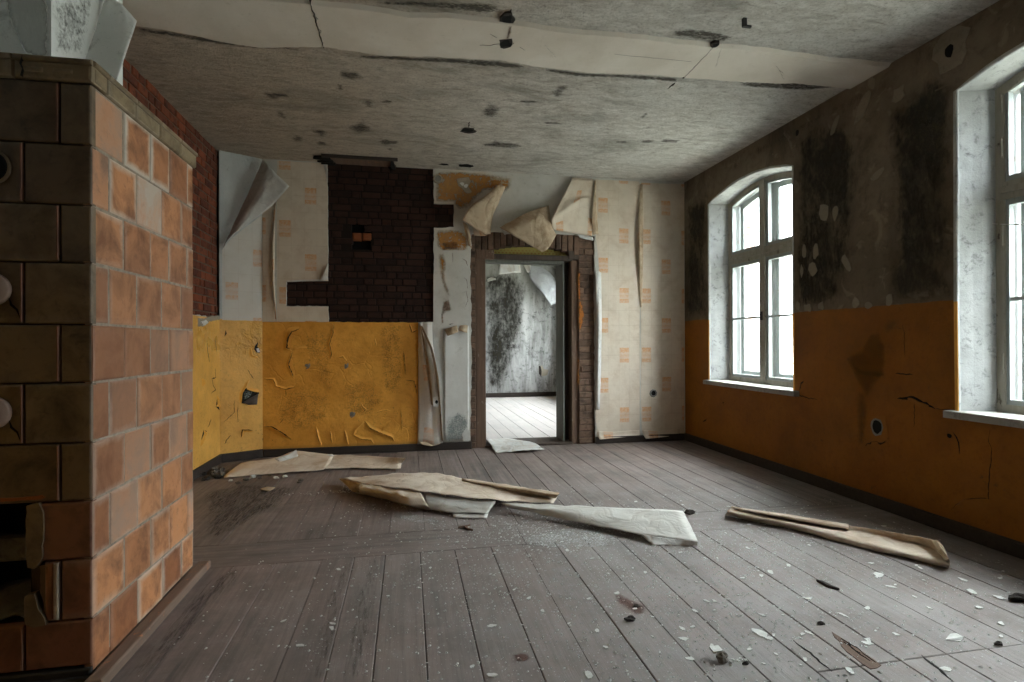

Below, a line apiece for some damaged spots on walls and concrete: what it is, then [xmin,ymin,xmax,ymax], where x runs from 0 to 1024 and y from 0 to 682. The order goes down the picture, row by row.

crack [309,0,324,48]
flaking render [123,58,289,327]
flaking render [287,163,472,369]
mould [798,129,852,304]
mould [895,82,949,294]
peeling [239,326,307,403]
peeling [316,403,402,445]
mould [487,276,524,387]
crack [895,326,960,454]